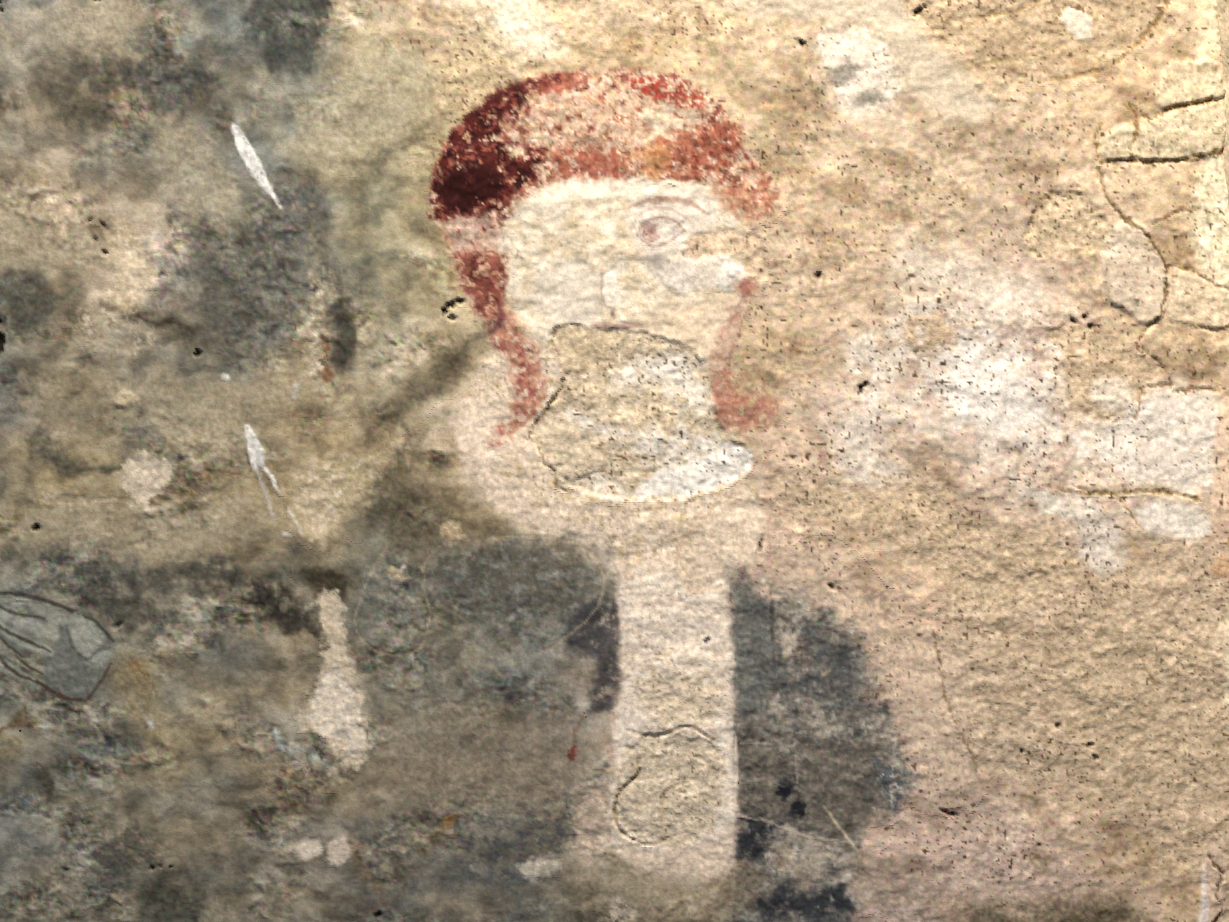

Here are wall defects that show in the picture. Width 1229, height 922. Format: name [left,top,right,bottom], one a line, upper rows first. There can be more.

damp [0,0,166,83]
damp [277,0,457,190]
crack [957,0,1170,86]
damp [0,176,108,291]
damp [131,103,261,242]
crack [1018,0,1229,422]
damp [0,338,335,588]